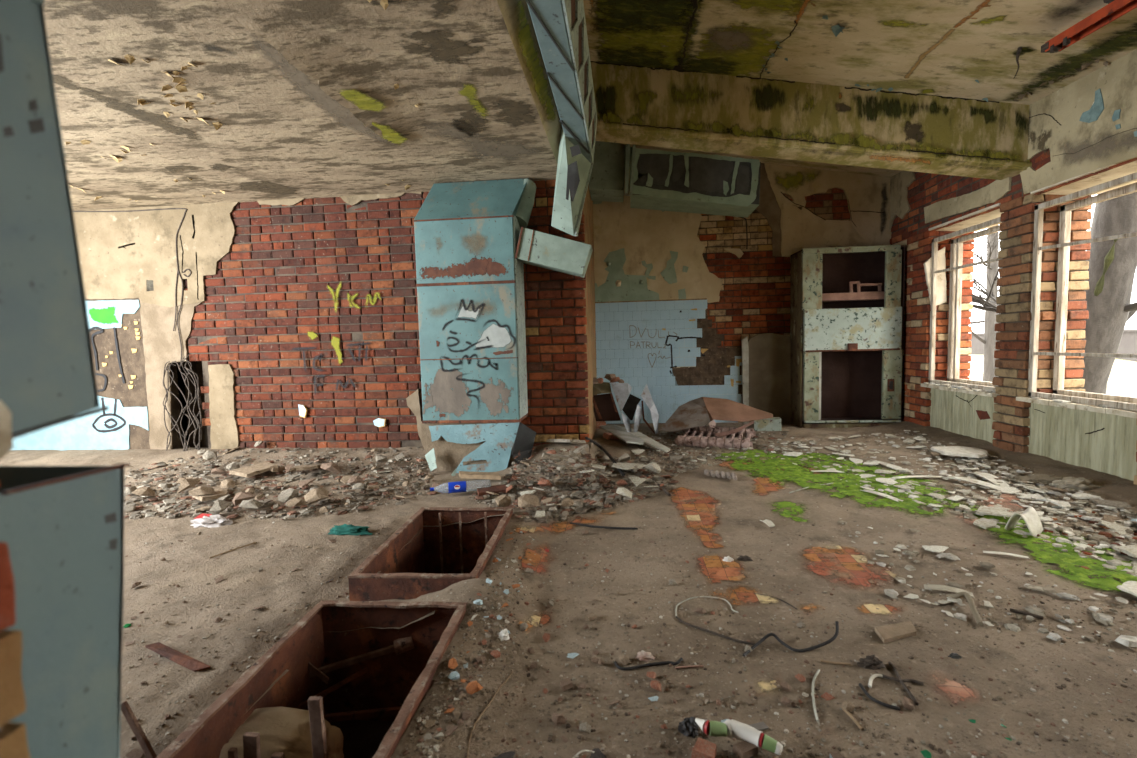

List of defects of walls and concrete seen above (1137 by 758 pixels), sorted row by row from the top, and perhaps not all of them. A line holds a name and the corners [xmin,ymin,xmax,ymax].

leakage [402,0,484,64]
crack [590,0,703,73]
crack [736,20,798,83]
leakage [753,84,785,111]
leakage [835,96,949,142]
crack [845,87,999,103]
leakage [970,106,996,124]
leakage [1004,23,1137,154]
leakage [165,164,233,172]
leakage [239,181,299,194]
spalling [595,147,851,396]
flaking render [139,180,515,450]